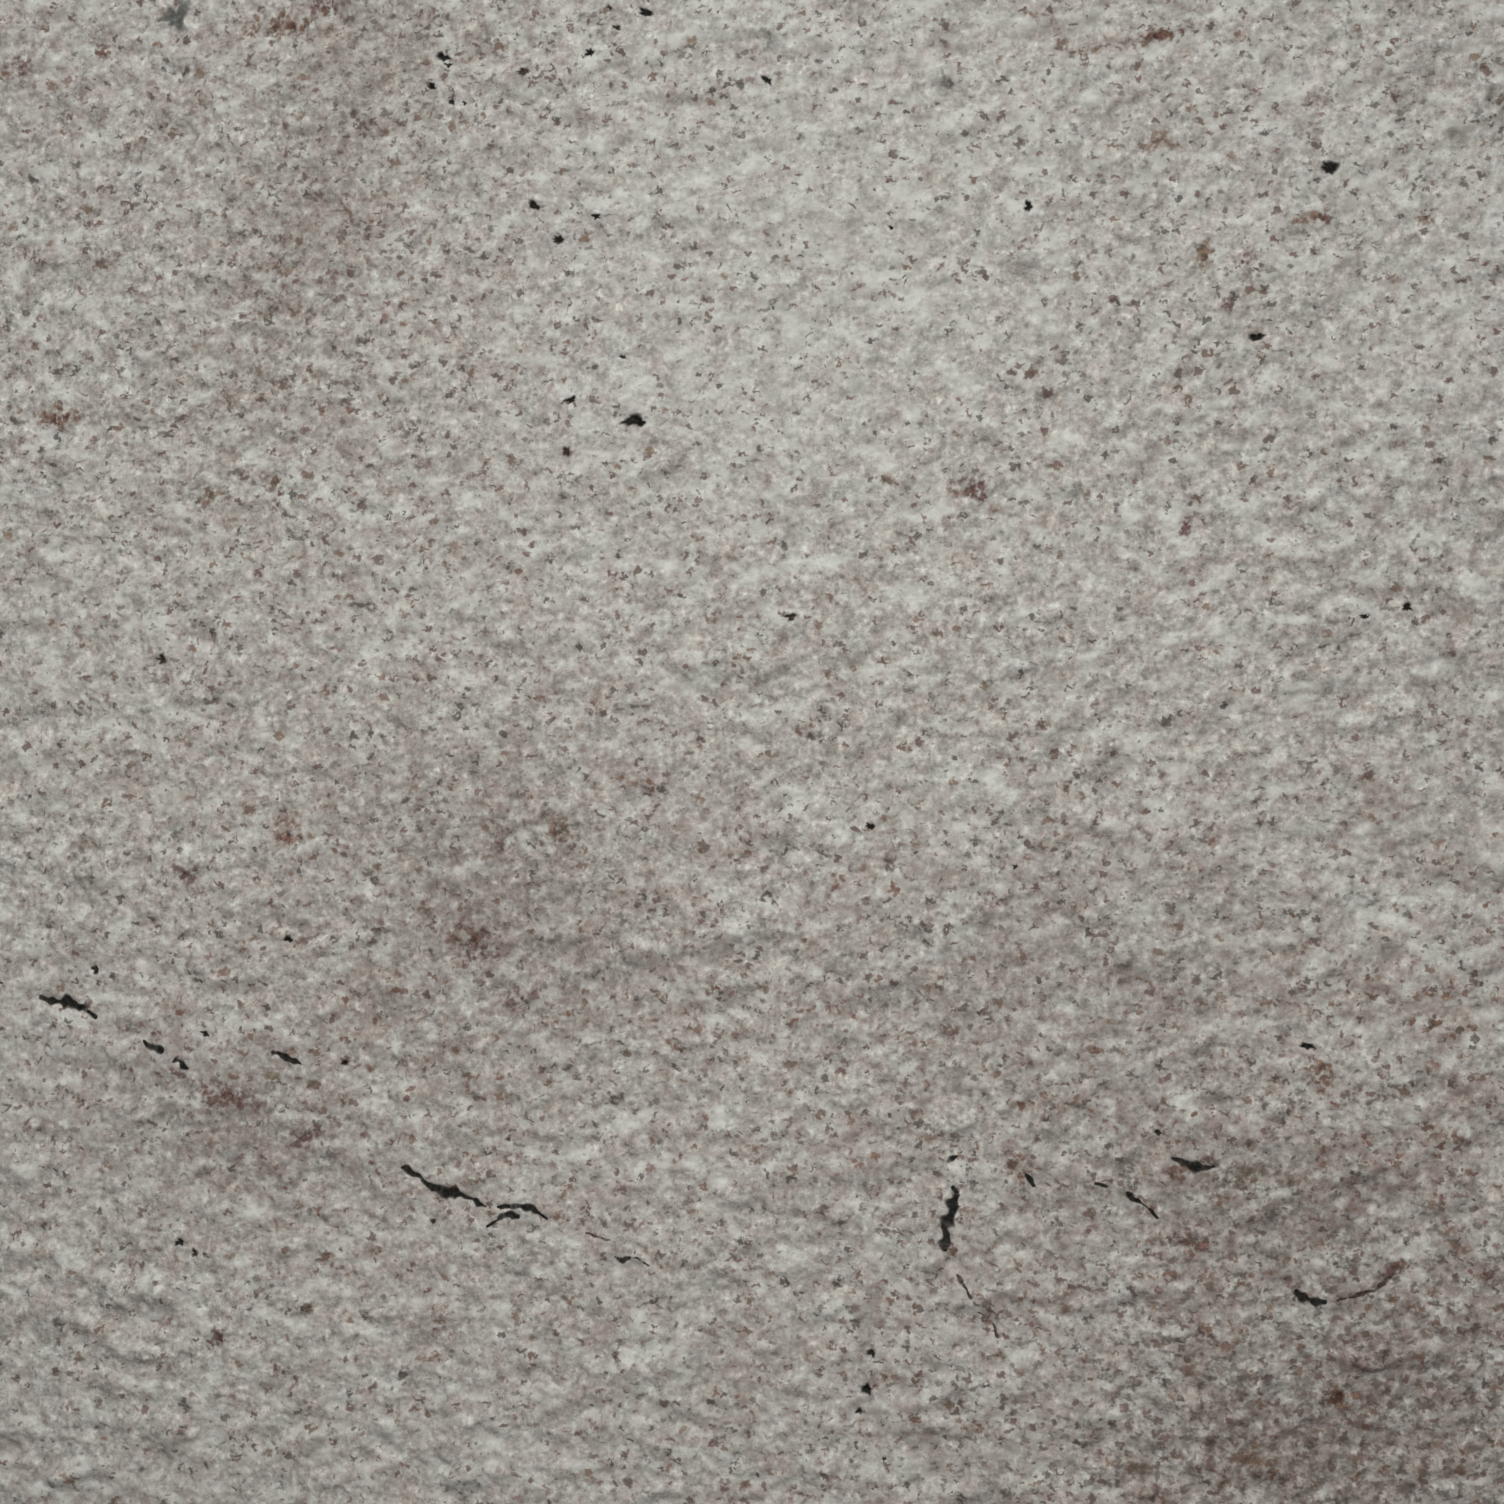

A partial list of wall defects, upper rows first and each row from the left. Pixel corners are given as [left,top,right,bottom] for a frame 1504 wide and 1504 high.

crack [39,994,97,1019]
crack [143,1039,188,1070]
crack [271,1050,302,1065]
crack [1171,1157,1215,1172]
crack [1024,1174,1035,1187]
crack [401,1165,548,1228]
crack [1094,1182,1159,1219]
crack [939,1155,999,1338]
crack [1294,1274,1394,1306]